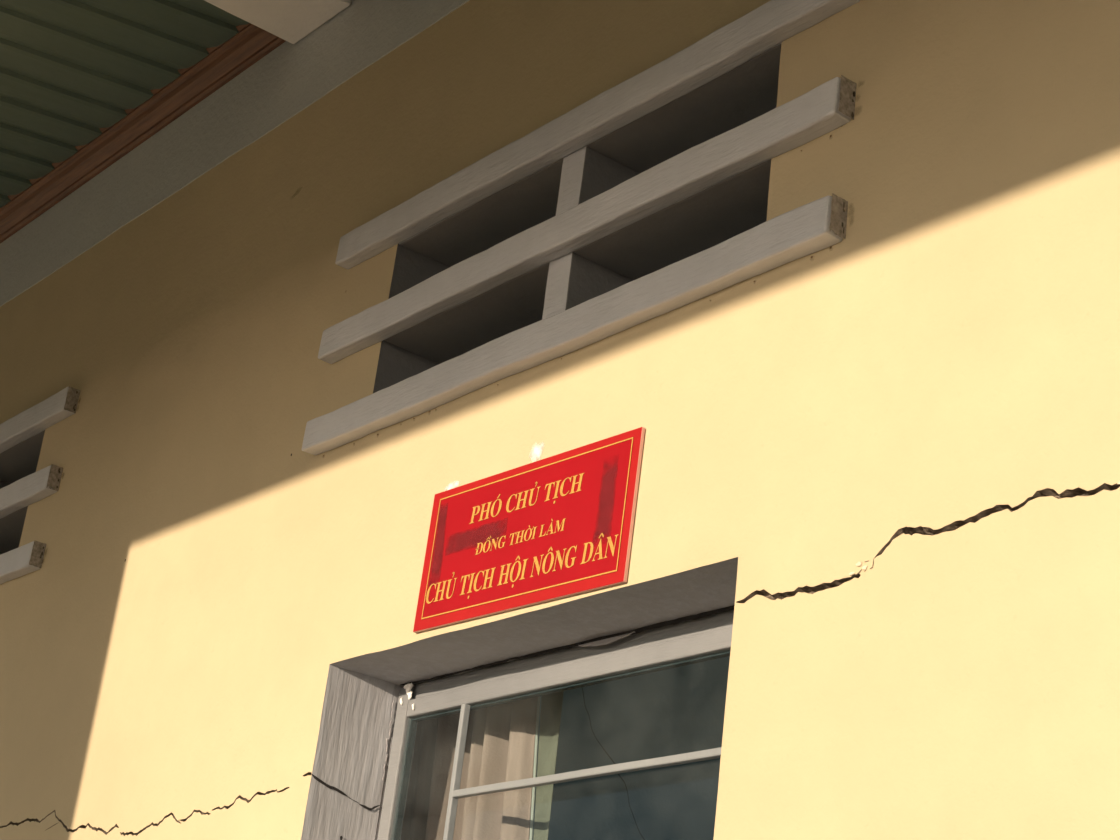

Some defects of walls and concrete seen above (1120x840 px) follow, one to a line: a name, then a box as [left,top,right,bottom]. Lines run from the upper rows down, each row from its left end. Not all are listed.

crack [401,482,1120,685]
crack [0,729,392,840]